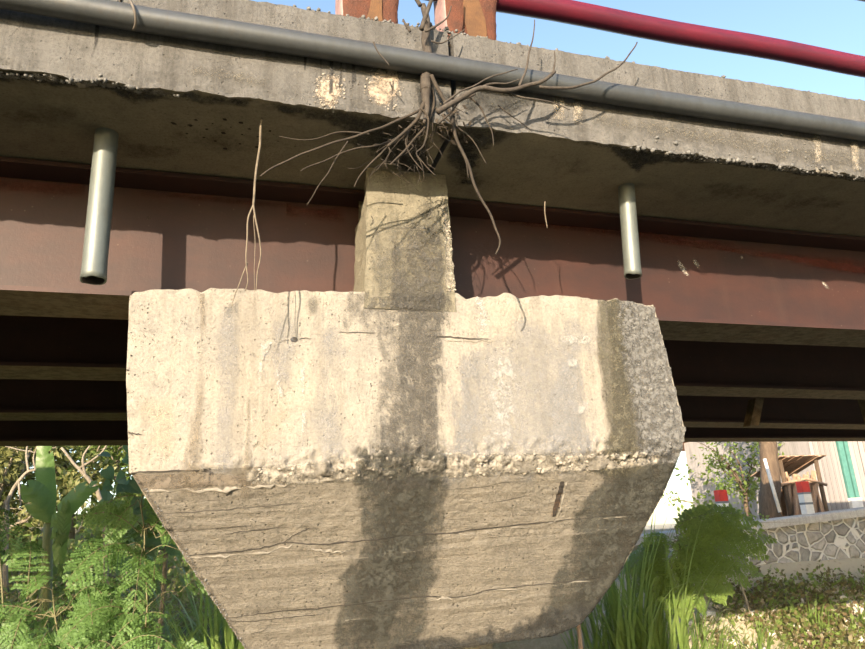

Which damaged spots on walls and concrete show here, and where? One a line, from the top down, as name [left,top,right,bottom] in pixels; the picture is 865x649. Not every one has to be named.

leakage [0,71,78,87]
leakage [90,81,164,101]
leakage [183,92,251,106]
spalling [313,60,404,113]
leakage [436,91,532,112]
leakage [277,105,427,172]
leakage [441,126,505,185]
spalling [131,388,662,649]
crack [176,503,642,559]
crack [226,575,613,634]